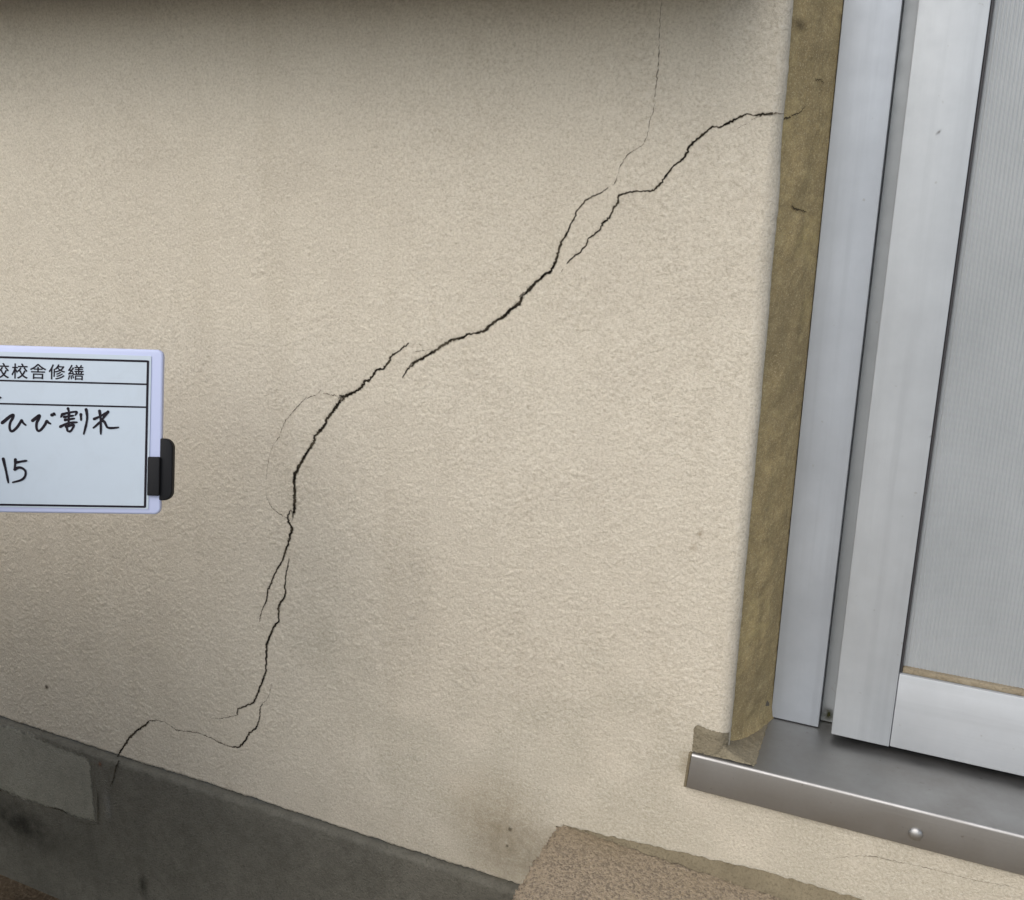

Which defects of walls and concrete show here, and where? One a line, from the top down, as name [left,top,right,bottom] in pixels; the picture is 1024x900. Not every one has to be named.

crack [49,0,806,825]